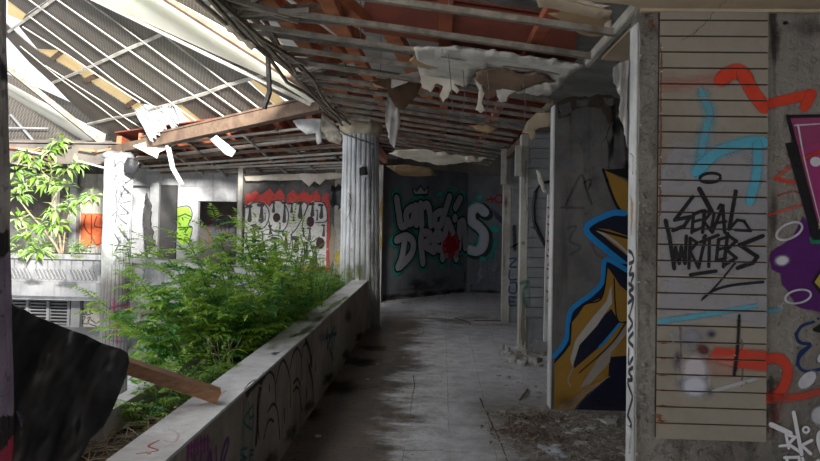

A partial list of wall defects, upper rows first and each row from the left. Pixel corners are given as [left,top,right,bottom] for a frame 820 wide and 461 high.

spalling [557,94,620,124]
crack [479,398,508,461]